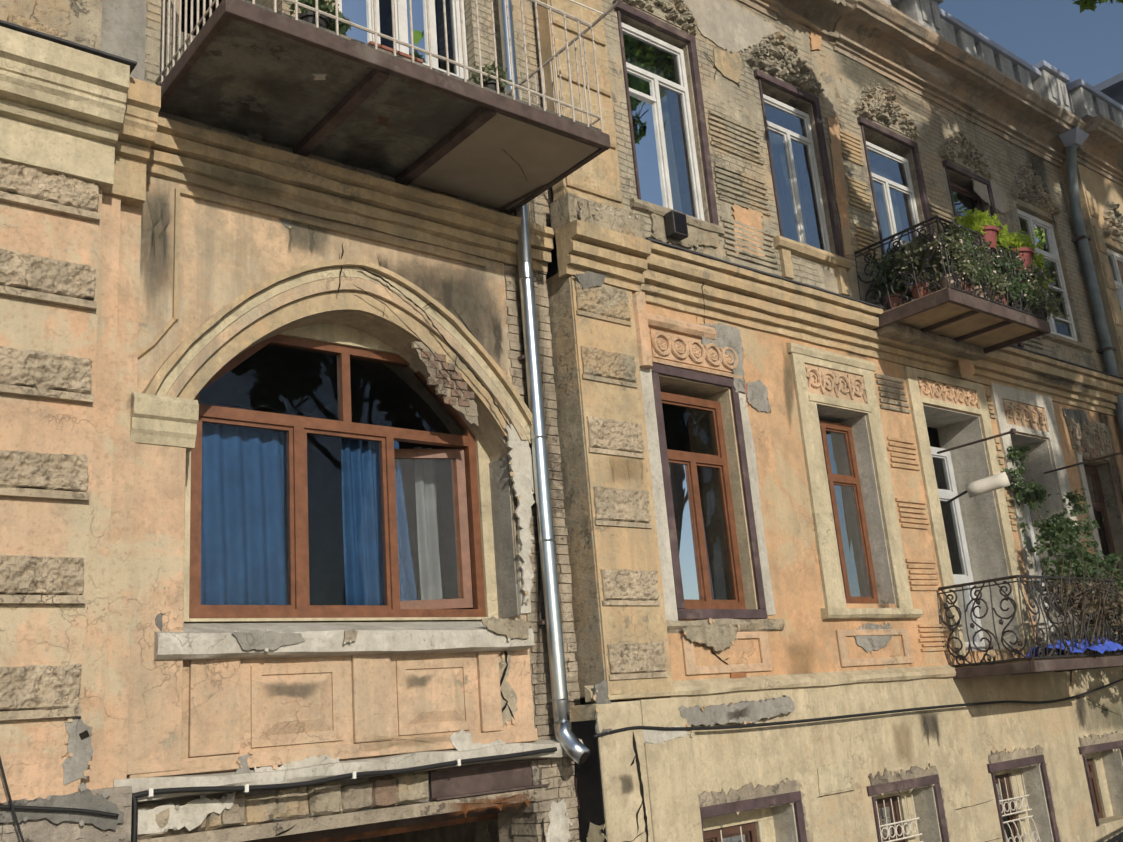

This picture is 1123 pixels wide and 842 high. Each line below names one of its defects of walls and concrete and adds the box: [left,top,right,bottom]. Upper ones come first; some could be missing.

damp [142,209,169,281]
crack [338,244,512,430]
flaking render [411,341,479,426]
spalling [700,323,751,404]
spalling [504,418,536,603]
spalling [681,618,740,651]
spalling [449,617,530,751]
crack [500,651,516,723]
spalling [61,716,94,792]
flaking render [131,771,429,840]
peeling [545,777,607,842]
crack [622,732,648,842]